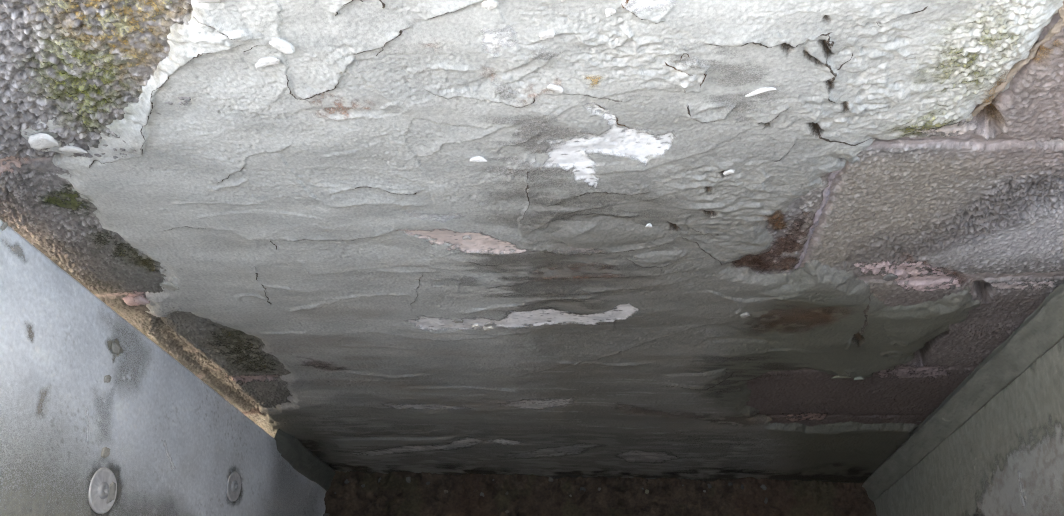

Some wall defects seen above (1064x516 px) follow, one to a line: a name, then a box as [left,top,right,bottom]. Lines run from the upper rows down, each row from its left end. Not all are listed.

peeling [255,38,295,69]
spalling [781,39,832,64]
crack [286,75,339,100]
crack [663,32,853,137]
crack [568,94,629,128]
peeling [0,133,88,174]
flaking render [543,103,673,187]
crack [817,127,875,146]
flaking render [402,229,526,254]
rust [733,211,808,271]
peeling [854,260,960,292]
flaking render [405,303,639,331]